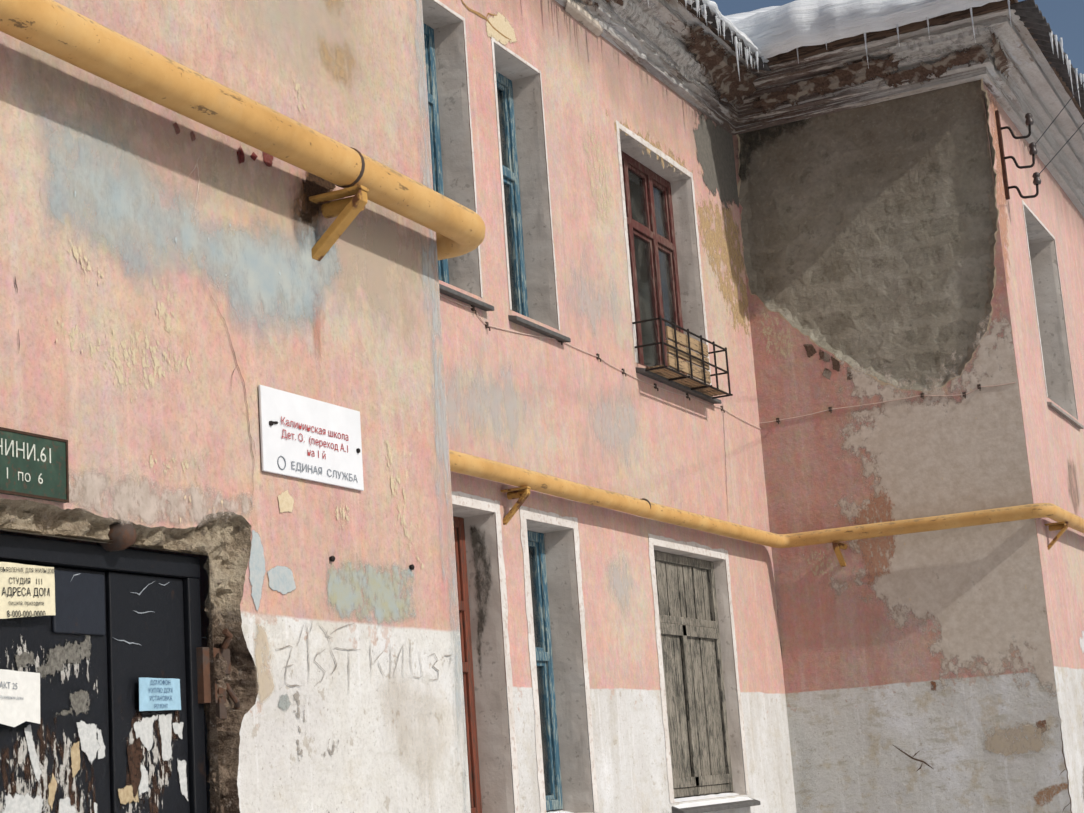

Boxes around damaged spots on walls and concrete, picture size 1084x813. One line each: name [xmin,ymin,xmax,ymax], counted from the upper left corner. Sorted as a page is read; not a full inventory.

crack [462,0,511,40]
peeling [486,11,517,46]
flaking render [565,0,1010,114]
peeling [606,113,687,170]
peeling [698,78,1033,525]
peeling [328,562,415,624]
peeling [831,518,1057,697]
flaking render [0,472,296,813]
peeling [293,692,306,761]